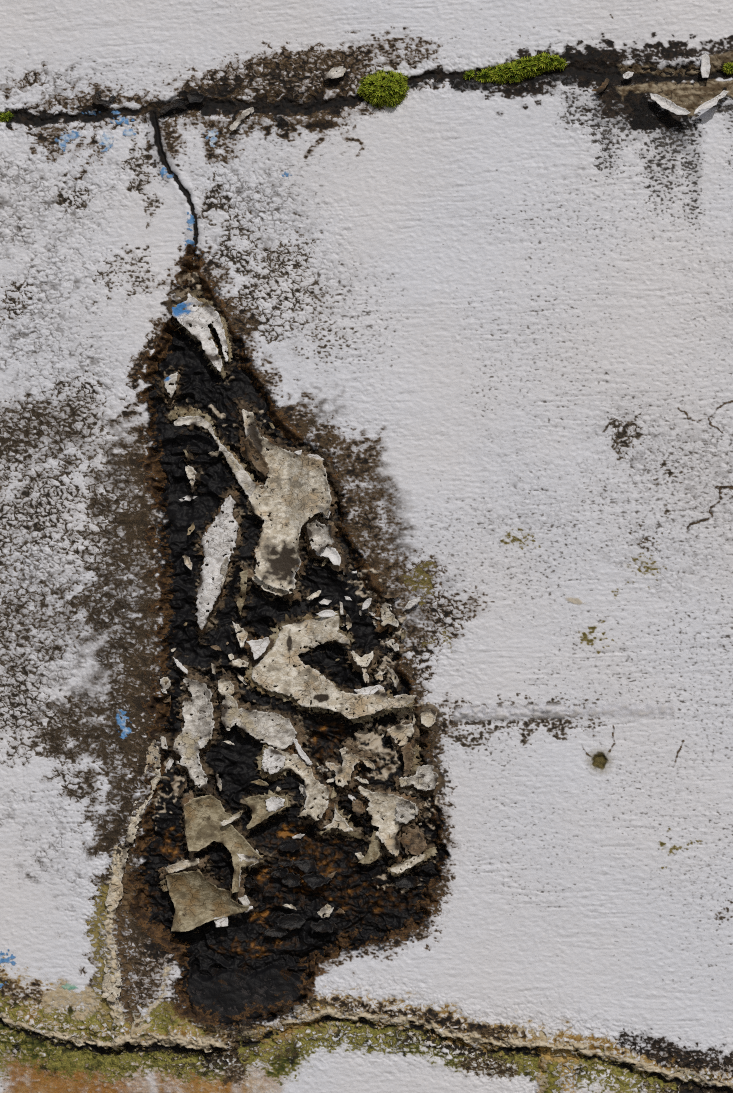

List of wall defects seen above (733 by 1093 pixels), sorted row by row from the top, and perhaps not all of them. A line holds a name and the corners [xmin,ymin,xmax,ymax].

leakage [0,64,163,228]
crack [0,62,733,264]
leakage [485,32,733,230]
leakage [92,244,183,305]
leakage [159,26,602,768]
leakage [0,317,202,1029]
peeling [116,709,132,739]
peeling [125,212,451,1037]
crack [0,740,733,1093]
leakage [322,786,457,973]
rust [7,1060,143,1093]
rust [182,1071,234,1093]